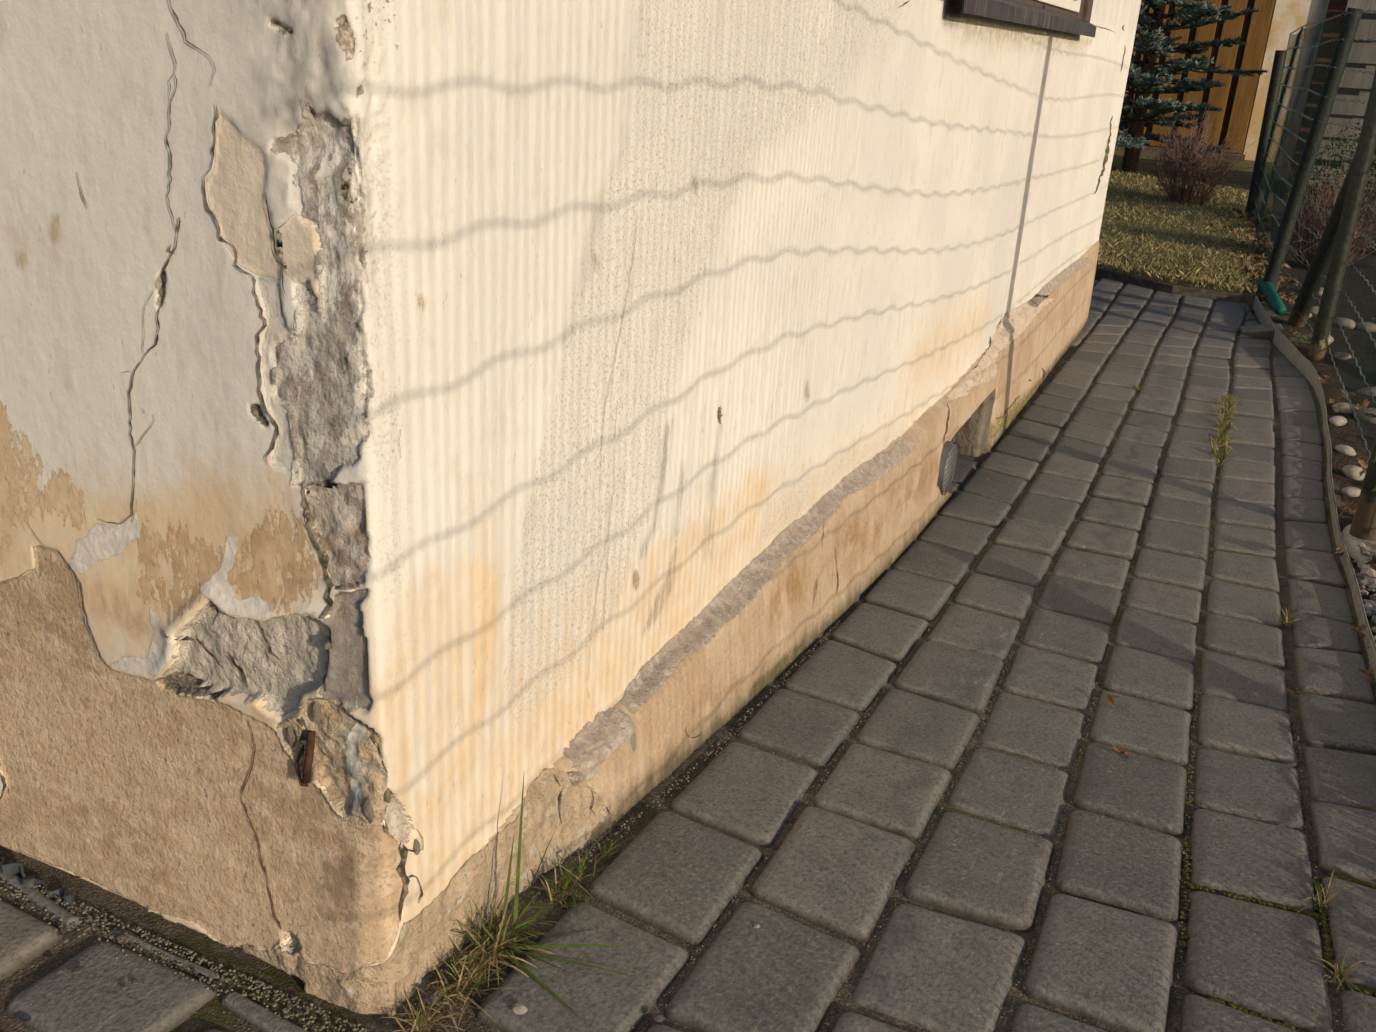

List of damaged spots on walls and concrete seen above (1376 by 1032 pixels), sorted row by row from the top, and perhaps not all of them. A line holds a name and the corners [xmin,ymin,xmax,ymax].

crack [99,0,301,524]
crack [1095,116,1113,193]
peeling [0,99,915,1017]
crack [161,603,281,929]
crack [296,714,308,773]
crack [335,698,388,773]